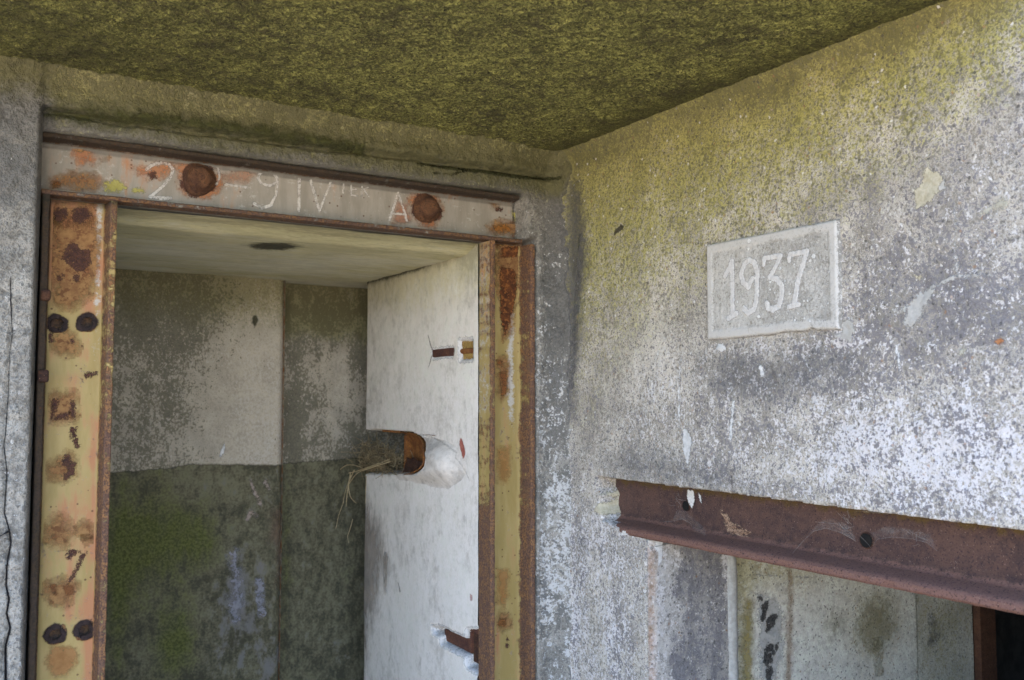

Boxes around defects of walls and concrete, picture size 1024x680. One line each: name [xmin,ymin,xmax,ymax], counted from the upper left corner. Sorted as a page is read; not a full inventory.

corrosion [52,149,100,192]
corrosion [137,163,251,199]
corrosion [51,205,101,309]
corrosion [489,203,520,341]
corrosion [48,330,82,355]
corrosion [496,356,510,399]
crack [0,278,13,680]
corrosion [45,392,81,481]
corrosion [42,514,94,606]
leakage [228,551,266,622]
leakage [364,506,387,614]
corrosion [47,647,77,676]